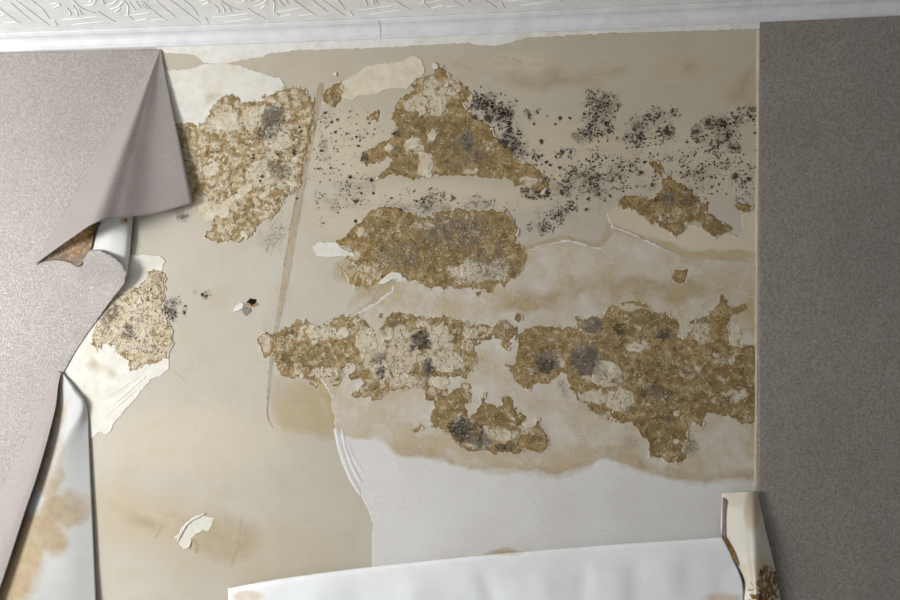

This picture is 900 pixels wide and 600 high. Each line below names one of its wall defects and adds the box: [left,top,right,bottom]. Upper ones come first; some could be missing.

spalling [176,72,344,243]
spalling [360,63,549,195]
leakage [386,85,757,243]
spalling [618,160,732,239]
spalling [335,205,527,297]
spalling [91,269,174,371]
spalling [256,294,759,465]
leakage [490,447,609,473]
peeling [174,513,214,549]